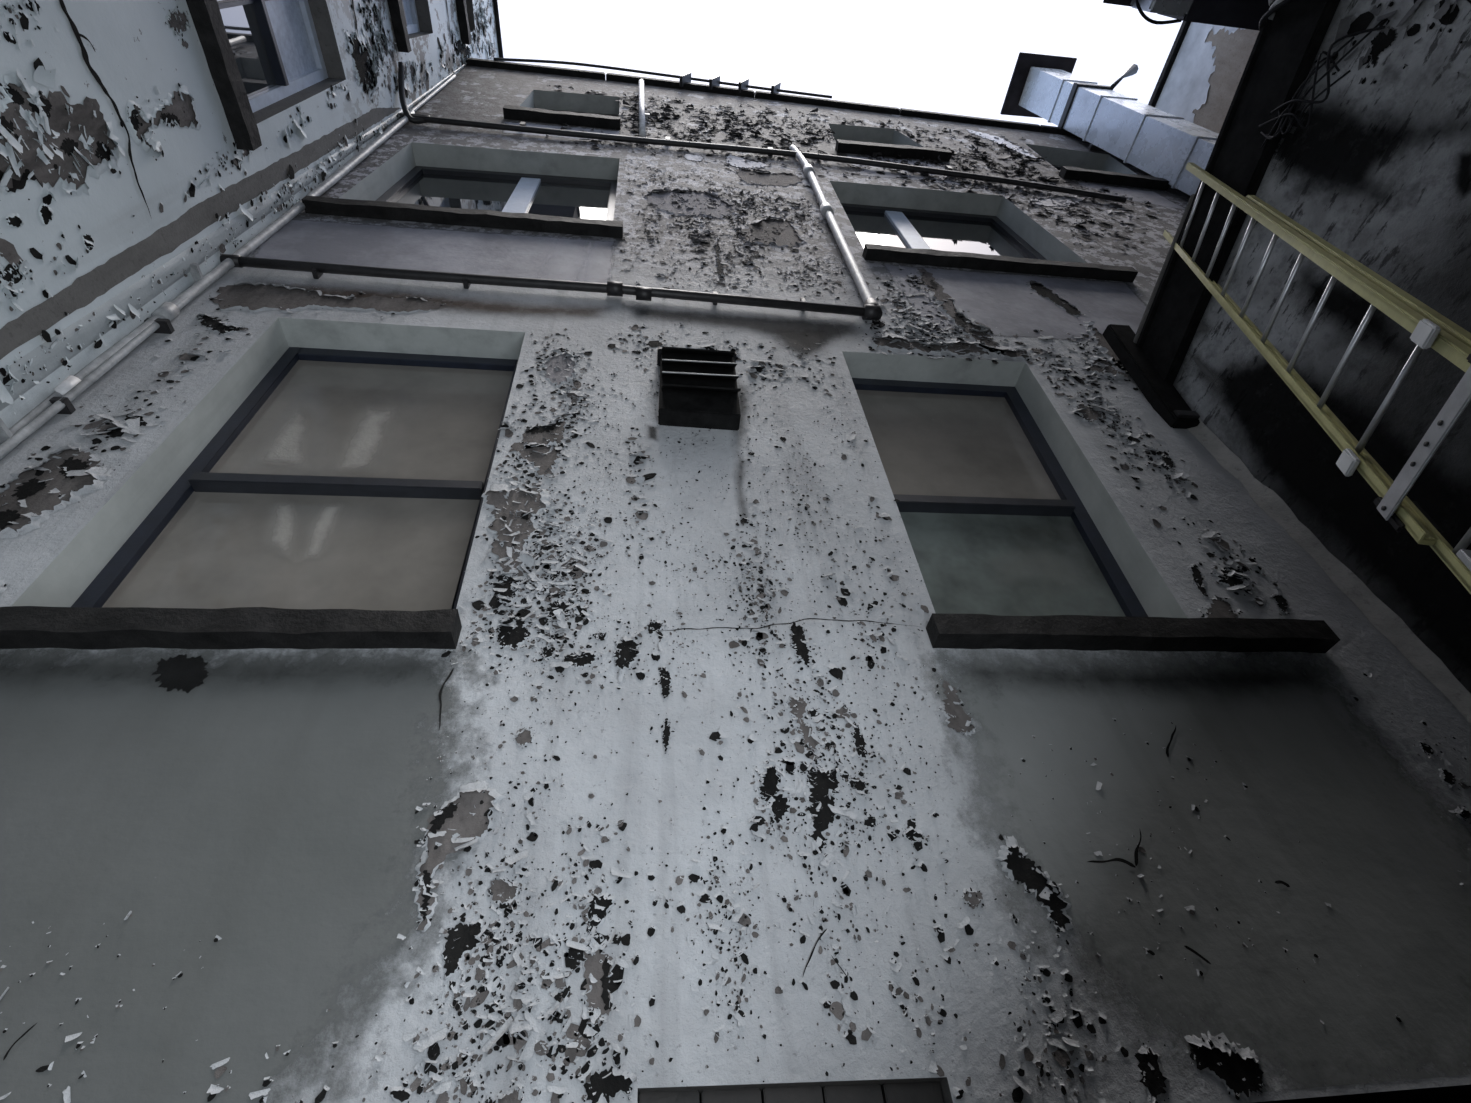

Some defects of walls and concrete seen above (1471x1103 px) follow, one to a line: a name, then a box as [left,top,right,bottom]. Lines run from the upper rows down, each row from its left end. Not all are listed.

peeling [546,84,1291,618]
peeling [0,281,453,539]
peeling [292,323,1170,1103]
peeling [0,921,72,1033]
peeling [60,998,98,1051]
peeling [36,1061,87,1103]
peeling [207,1057,232,1102]
peeling [249,1045,303,1103]
spalling [1184,1030,1265,1103]